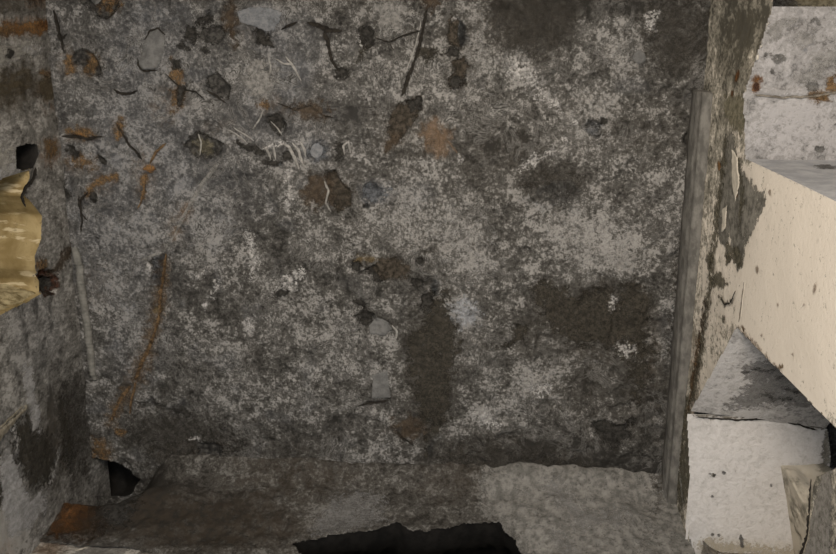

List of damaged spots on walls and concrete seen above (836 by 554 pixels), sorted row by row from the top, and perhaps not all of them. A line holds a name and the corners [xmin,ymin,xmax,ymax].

rust [0,19,48,38]
water stain [0,61,54,106]
spalling [16,143,39,171]
peeling [705,132,767,323]
water stain [371,177,587,468]
spalling [108,460,140,497]
rust [36,503,106,554]
spalling [292,522,521,554]